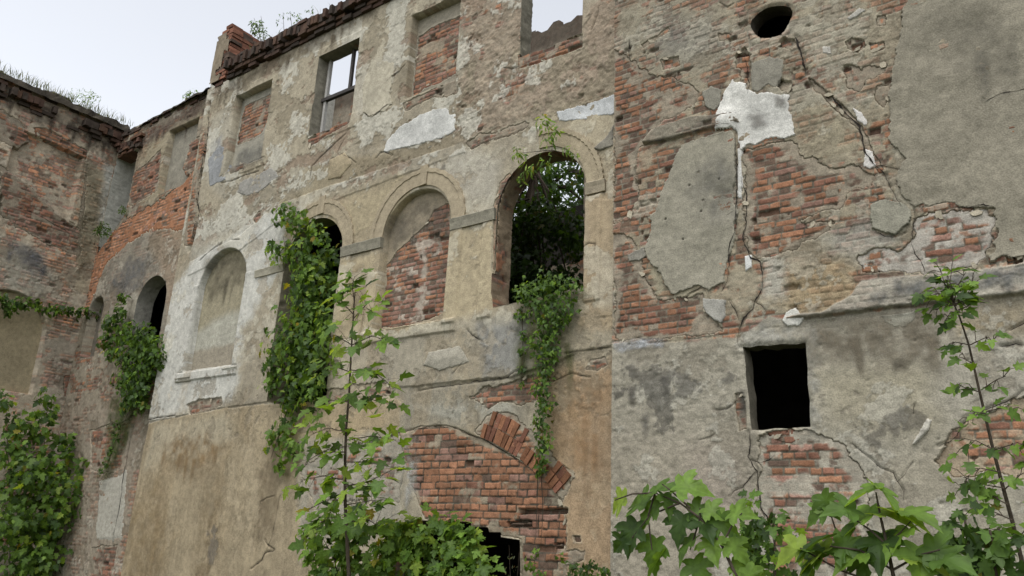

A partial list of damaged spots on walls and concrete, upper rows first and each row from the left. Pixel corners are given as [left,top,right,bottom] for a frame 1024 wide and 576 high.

spalling [83,132,207,316]
spalling [382,203,450,328]
spalling [404,17,460,111]
spalling [613,50,723,344]
crack [640,122,764,345]
spalling [742,141,875,259]
crack [795,37,927,270]
peeling [843,0,1024,275]
flaking render [301,374,585,576]
crack [731,432,771,518]
spalling [757,429,869,576]
spalling [935,398,1024,480]